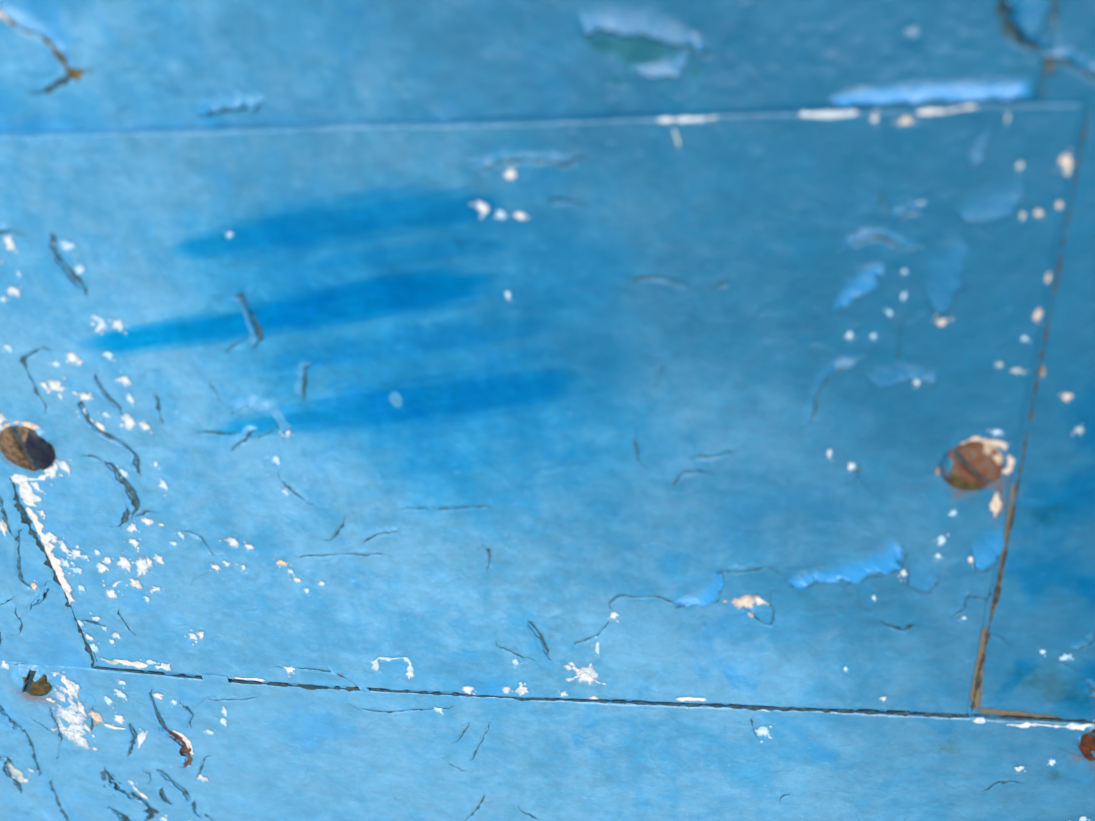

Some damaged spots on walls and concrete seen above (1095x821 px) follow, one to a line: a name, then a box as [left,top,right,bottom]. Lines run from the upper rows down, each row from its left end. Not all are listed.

crack [0,0,94,94]
peeling [575,3,709,92]
crack [995,0,1095,99]
peeling [799,76,1035,128]
crack [20,348,153,527]
peeling [38,351,153,434]
crack [191,360,313,451]
crack [210,107,1095,737]
peeling [10,459,184,606]
crack [0,478,213,821]
peeling [77,612,171,671]
peeling [46,671,149,751]